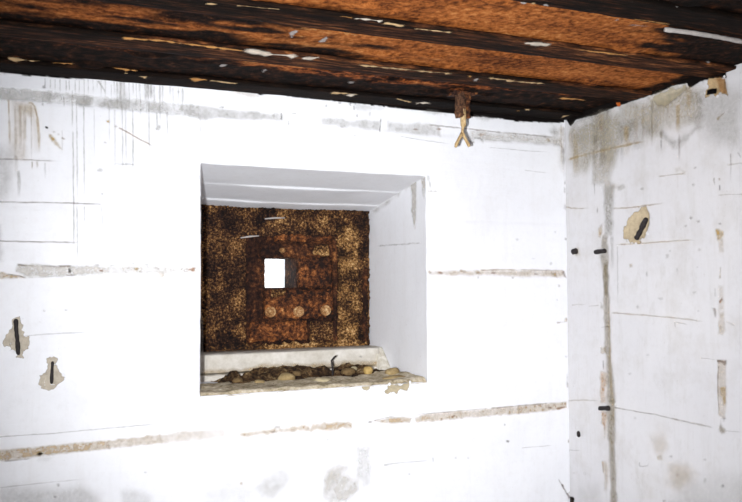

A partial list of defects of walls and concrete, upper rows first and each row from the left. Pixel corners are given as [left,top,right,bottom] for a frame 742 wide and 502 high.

spalling [0,71,83,79]
spalling [292,92,455,114]
spalling [470,73,728,126]
rust [201,204,369,218]
spalling [622,206,652,245]
spalling [3,316,30,358]
spalling [36,354,65,390]
water stain [604,260,616,502]